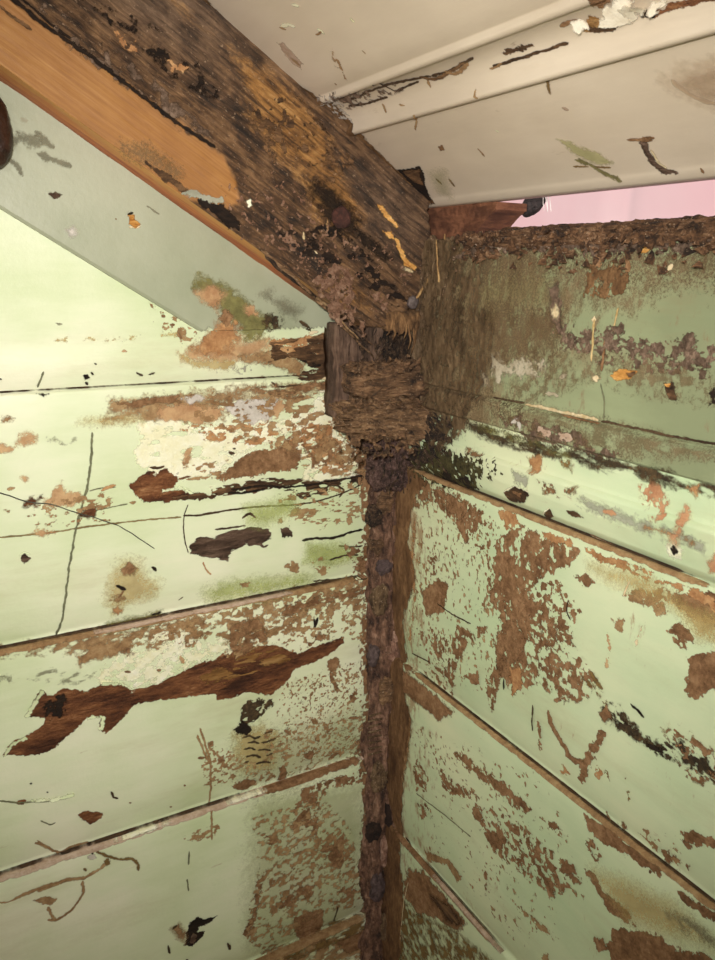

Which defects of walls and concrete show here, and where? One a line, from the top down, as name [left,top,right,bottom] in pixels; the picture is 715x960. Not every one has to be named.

peeling [570,0,715,35]
leakage [458,306,715,461]
peeling [129,466,193,504]
crack [0,433,367,635]
peeling [189,525,293,575]
peeling [3,638,344,756]
peeling [0,792,74,805]
peeling [78,811,103,824]
spalling [172,916,216,946]